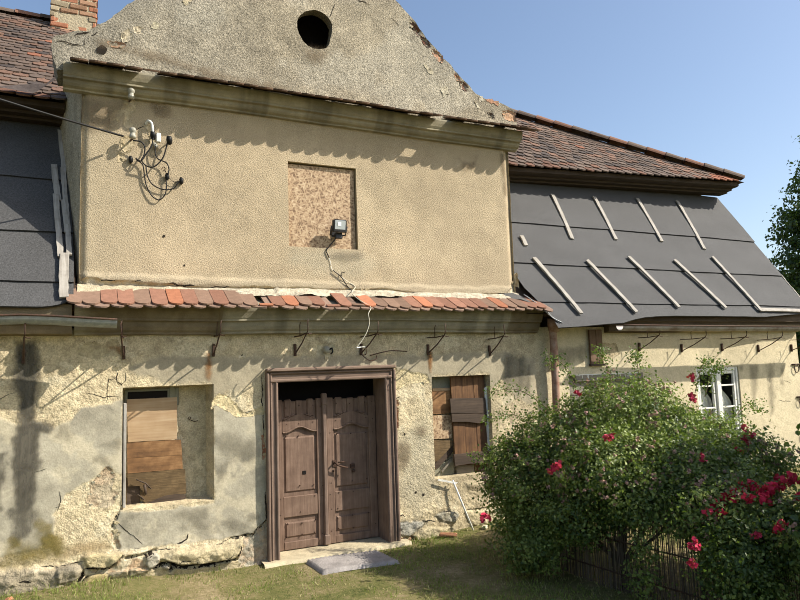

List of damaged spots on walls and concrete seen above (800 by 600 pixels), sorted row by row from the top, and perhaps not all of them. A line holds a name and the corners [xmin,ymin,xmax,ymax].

crack [88,373,126,400]
peeling [211,393,265,417]
water stain [9,342,53,543]
peeling [86,467,119,508]